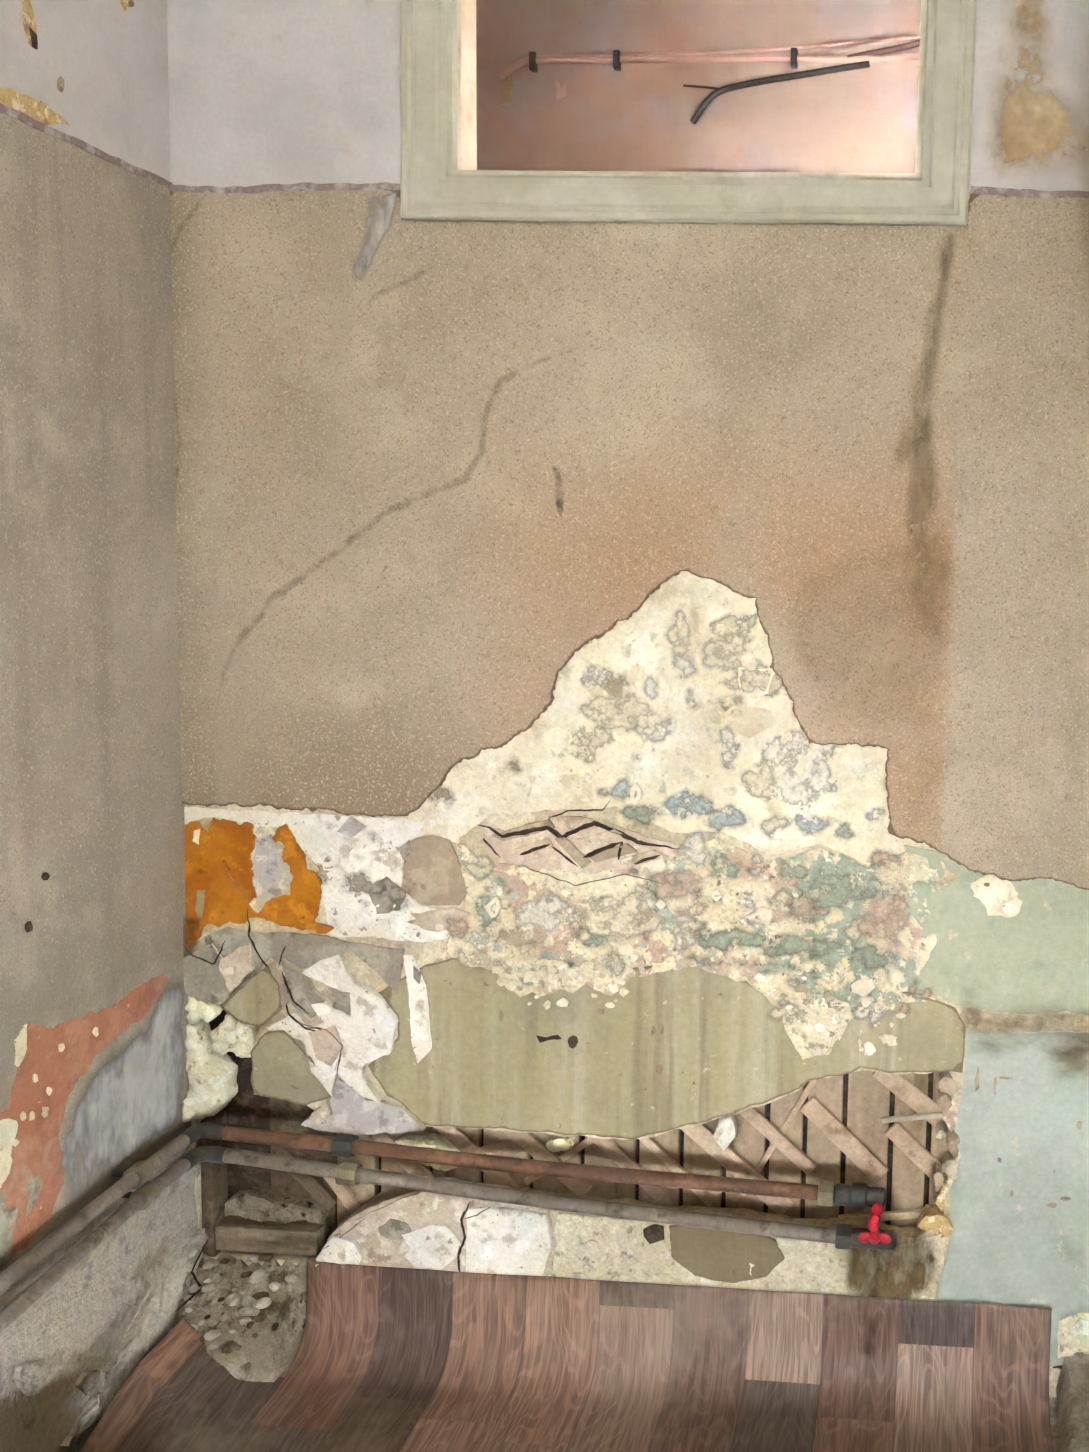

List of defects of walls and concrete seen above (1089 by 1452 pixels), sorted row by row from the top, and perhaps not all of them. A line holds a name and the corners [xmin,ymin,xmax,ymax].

flaking render [22,0,38,49]
peeling [0,88,69,125]
water stain [1004,88,1069,160]
peeling [0,571,1022,1446]